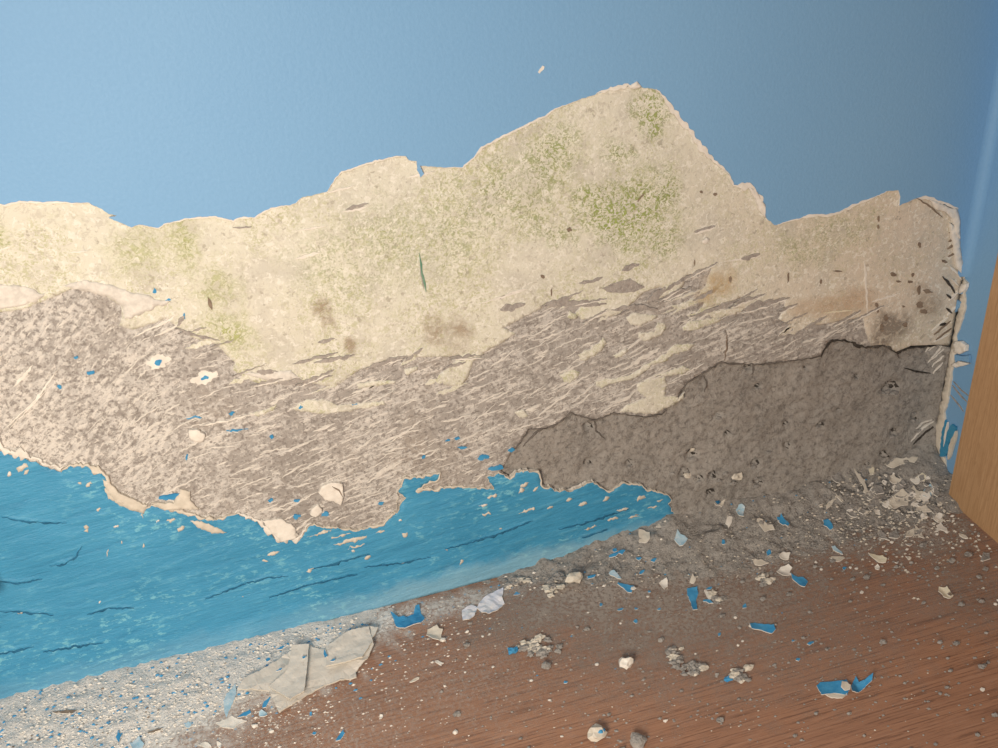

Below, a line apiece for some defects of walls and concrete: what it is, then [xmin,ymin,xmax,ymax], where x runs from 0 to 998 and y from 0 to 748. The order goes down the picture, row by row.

water stain [639,93,663,136]
water stain [583,179,677,250]
peeling [0,81,971,564]
water stain [110,294,903,531]
crack [515,330,936,449]
crack [2,515,67,524]
crack [0,545,82,616]
crack [87,604,134,615]
crack [0,640,104,655]